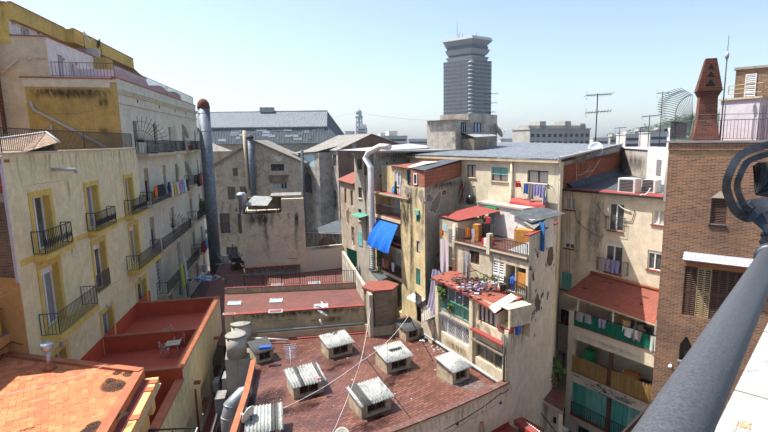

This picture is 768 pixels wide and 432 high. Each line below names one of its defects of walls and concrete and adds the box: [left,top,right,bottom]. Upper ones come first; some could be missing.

spalling [403,179,448,215]
spalling [528,247,555,322]